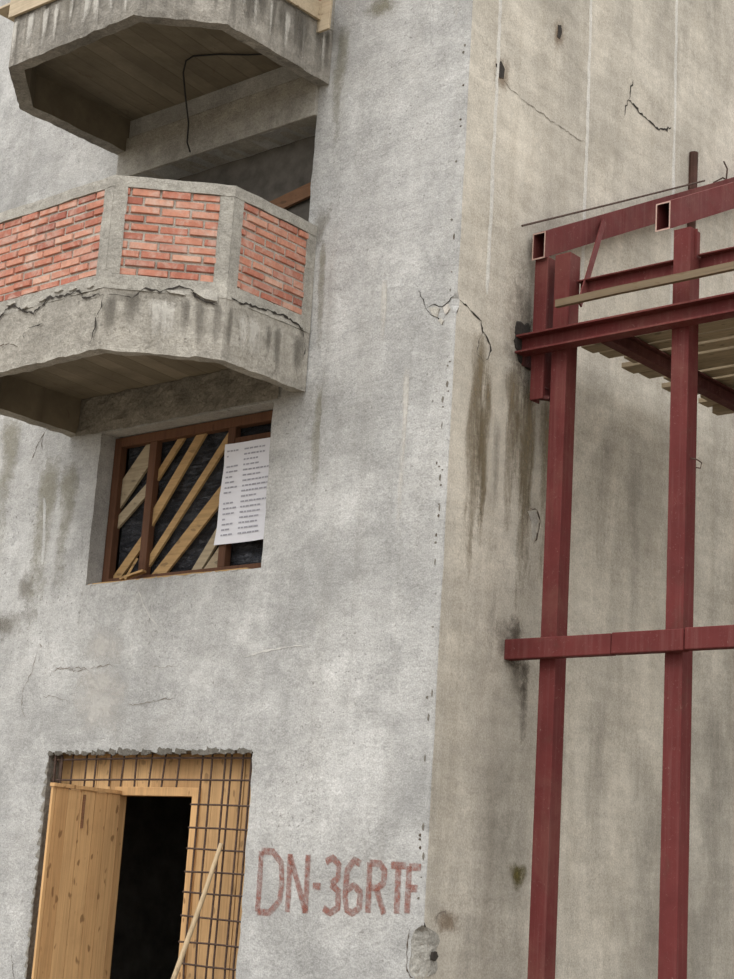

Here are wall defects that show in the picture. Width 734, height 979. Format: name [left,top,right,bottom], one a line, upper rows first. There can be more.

water stain [12,6,58,46]
water stain [247,0,308,40]
crack [504,81,585,142]
crack [625,84,671,132]
water stain [152,301,202,326]
spalling [166,289,218,304]
water stain [215,308,280,352]
crack [419,291,492,360]
water stain [468,346,491,515]
water stain [507,374,550,546]
spalling [406,927,440,978]